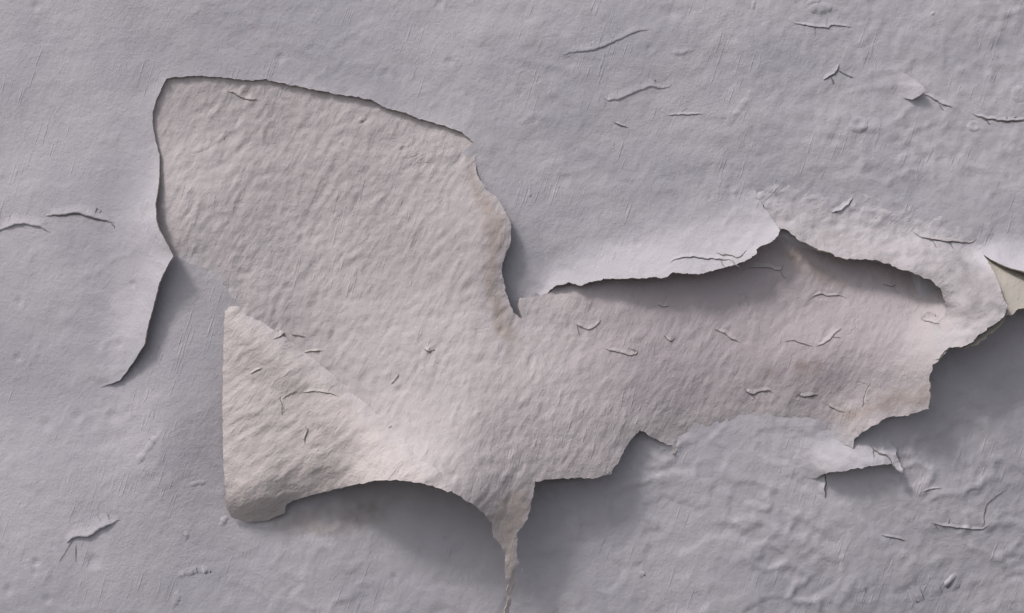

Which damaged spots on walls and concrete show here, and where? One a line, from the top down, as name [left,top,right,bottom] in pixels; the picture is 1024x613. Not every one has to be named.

crack [562,26,650,57]
crack [823,64,852,84]
peeling [893,69,925,100]
crack [599,79,672,128]
crack [925,93,1024,124]
crack [45,203,115,228]
flaking render [90,76,1024,613]
crack [930,489,1008,530]